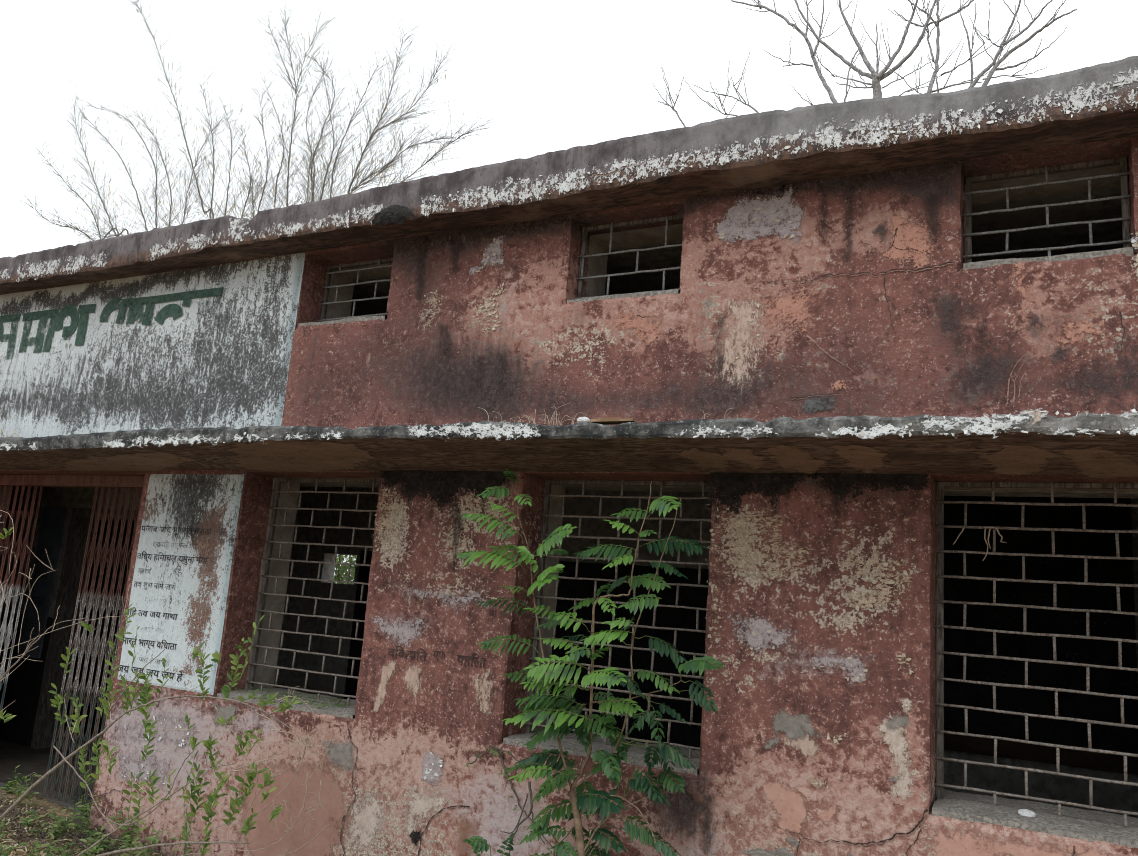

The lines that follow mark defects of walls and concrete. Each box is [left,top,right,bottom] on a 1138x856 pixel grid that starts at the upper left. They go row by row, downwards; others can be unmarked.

peeling [147,68,1138,268]
peeling [715,282,822,390]
crack [744,222,953,352]
peeling [371,484,403,552]
peeling [702,497,932,648]
flaking render [877,698,913,800]
peeling [740,777,837,856]
crack [767,809,928,856]
peeling [931,826,1113,856]